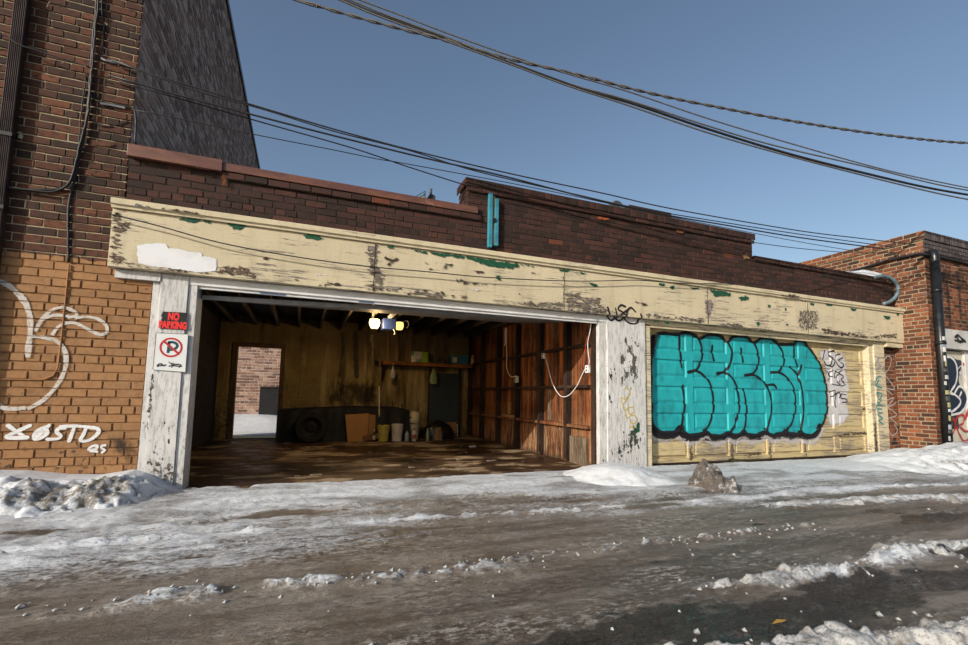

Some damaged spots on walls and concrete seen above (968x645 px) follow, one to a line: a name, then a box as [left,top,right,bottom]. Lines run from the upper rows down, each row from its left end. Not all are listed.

peeling [108,204,257,278]
peeling [365,245,536,300]
peeling [503,269,606,315]
peeling [635,289,749,324]
peeling [782,294,897,339]
peeling [608,336,640,390]
peeling [618,422,641,460]
peeling [143,458,176,485]